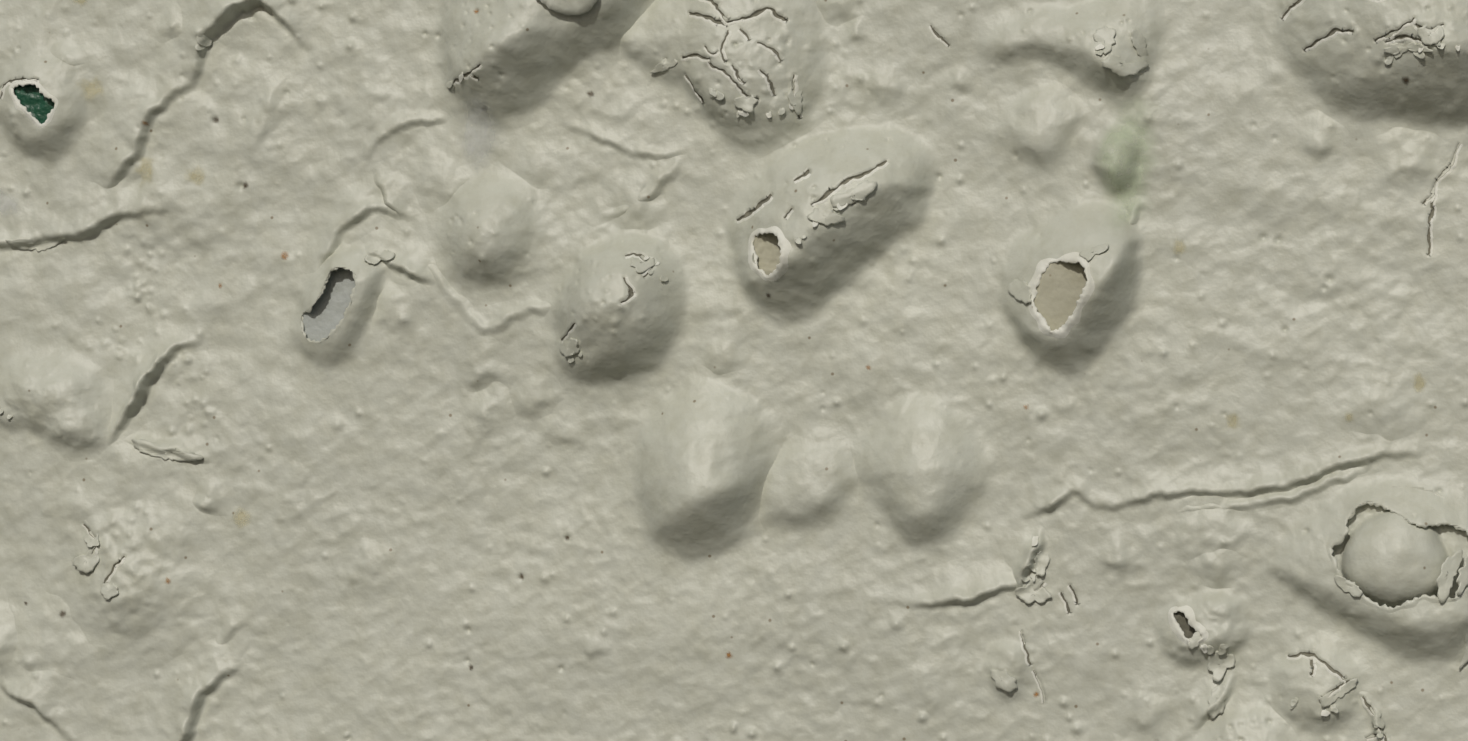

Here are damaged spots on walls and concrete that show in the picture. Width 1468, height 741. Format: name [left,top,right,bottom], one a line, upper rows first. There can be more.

peeling [0,0,336,267]
peeling [293,93,551,345]
crack [681,0,803,119]
crack [736,158,889,224]
crack [1279,0,1444,52]
peeling [884,427,1436,626]